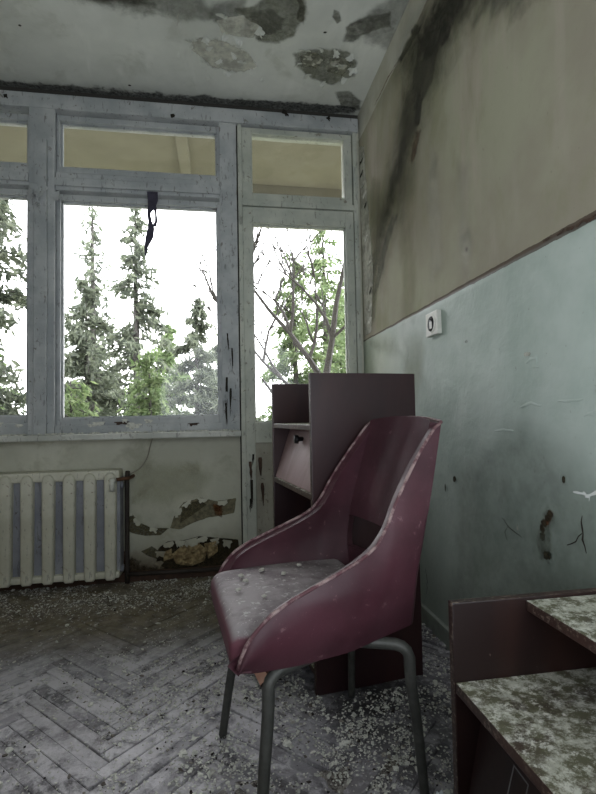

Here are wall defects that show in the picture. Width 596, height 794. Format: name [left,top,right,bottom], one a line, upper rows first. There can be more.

peeling [183,13,267,82]
water stain [237,0,306,42]
peeling [294,48,359,87]
water stain [346,13,390,41]
water stain [373,0,471,276]
flaking render [124,498,239,569]
crack [567,517,587,553]